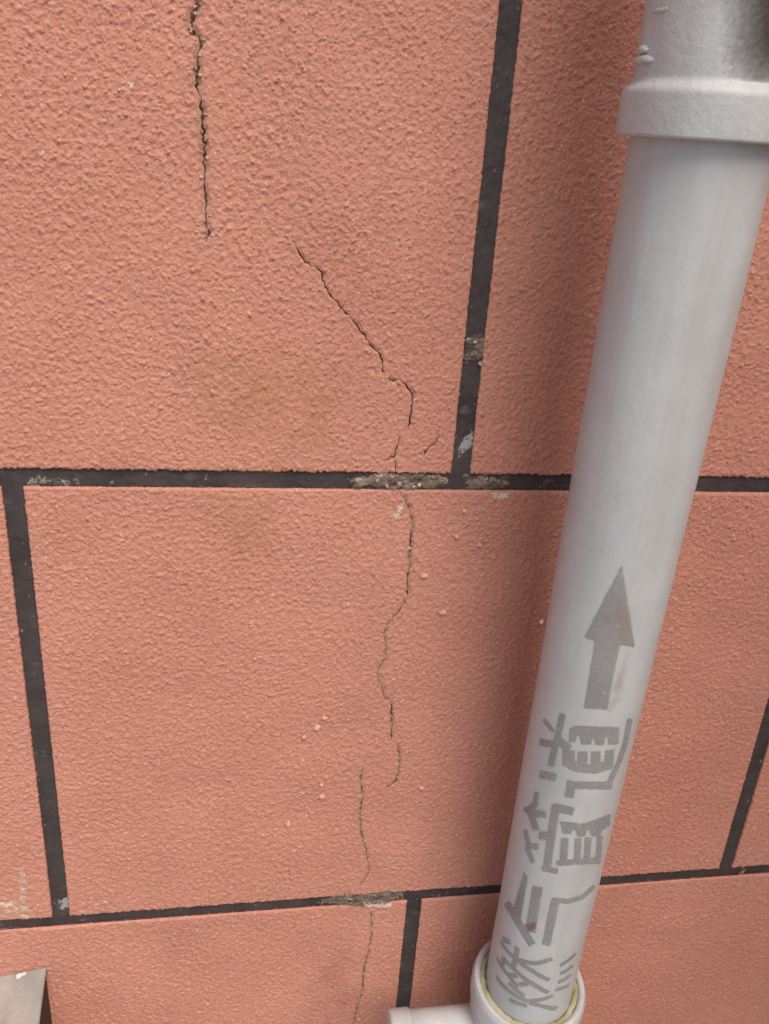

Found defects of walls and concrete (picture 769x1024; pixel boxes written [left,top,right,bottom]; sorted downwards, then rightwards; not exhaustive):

crack [187,0,215,243]
crack [292,240,439,886]
crack [351,911,374,1023]